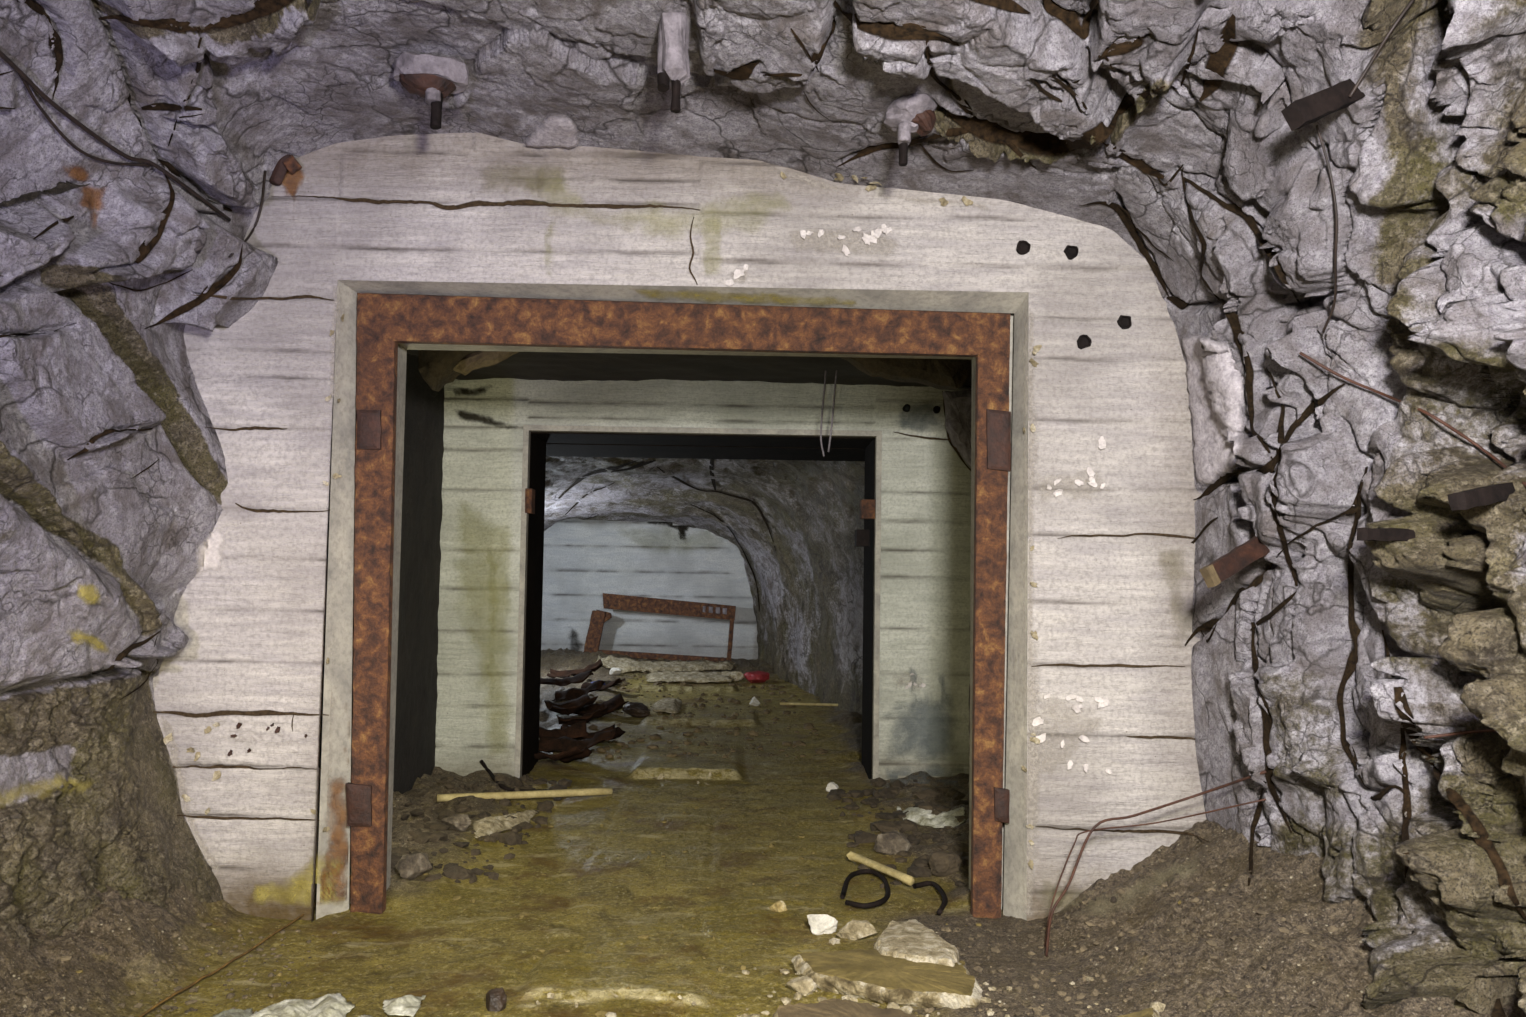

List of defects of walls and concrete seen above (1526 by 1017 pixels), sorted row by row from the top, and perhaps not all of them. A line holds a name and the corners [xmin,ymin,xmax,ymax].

crack [274,196,700,285]
rust [534,659,629,763]
water stain [901,704,948,776]